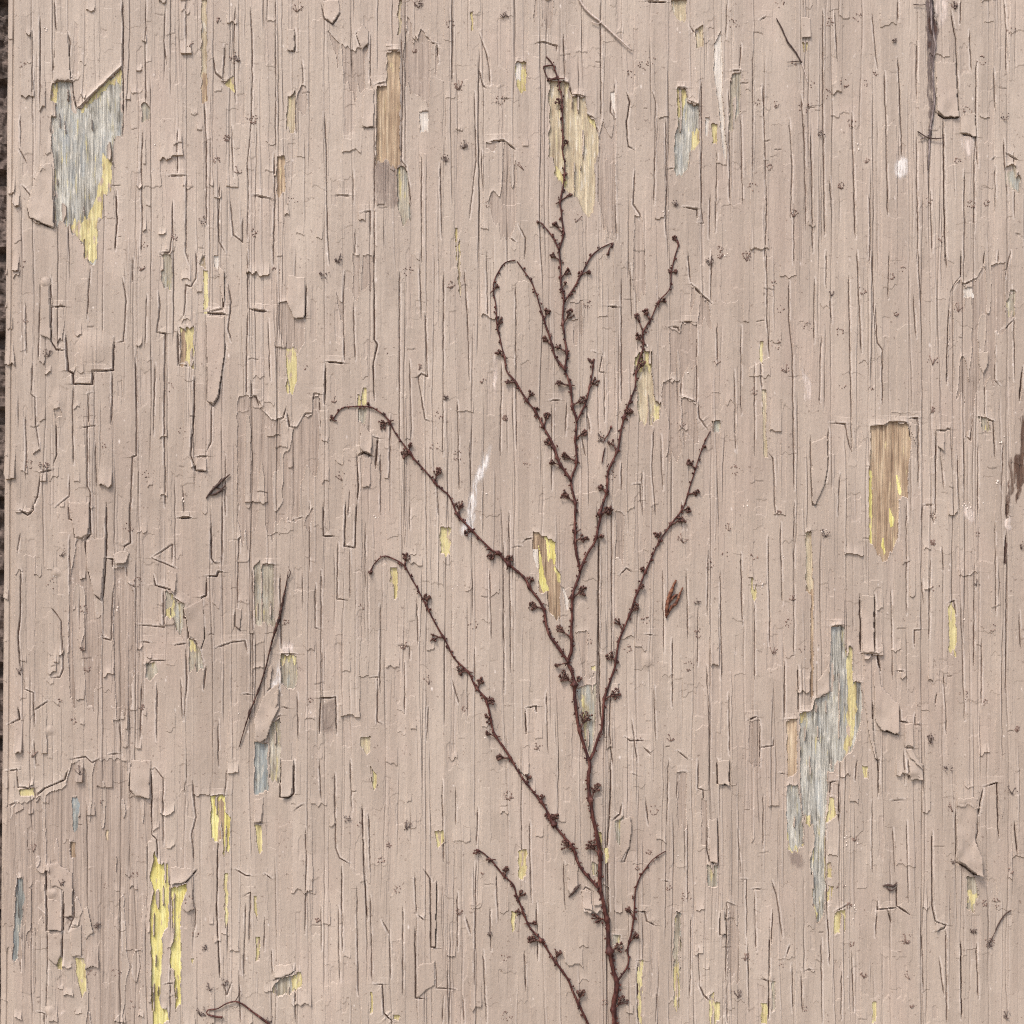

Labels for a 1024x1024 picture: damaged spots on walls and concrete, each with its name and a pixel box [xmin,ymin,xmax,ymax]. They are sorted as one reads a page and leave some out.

peeling [27,32,123,265]
peeling [548,81,617,238]
crack [7,0,488,807]
peeling [254,654,298,853]
crack [452,524,532,702]
crack [543,0,1023,1021]
peeling [786,532,874,935]
peeling [868,422,917,562]
crack [38,876,75,1022]
peeling [3,758,196,1024]
crack [129,769,296,1022]
crack [280,763,498,1020]